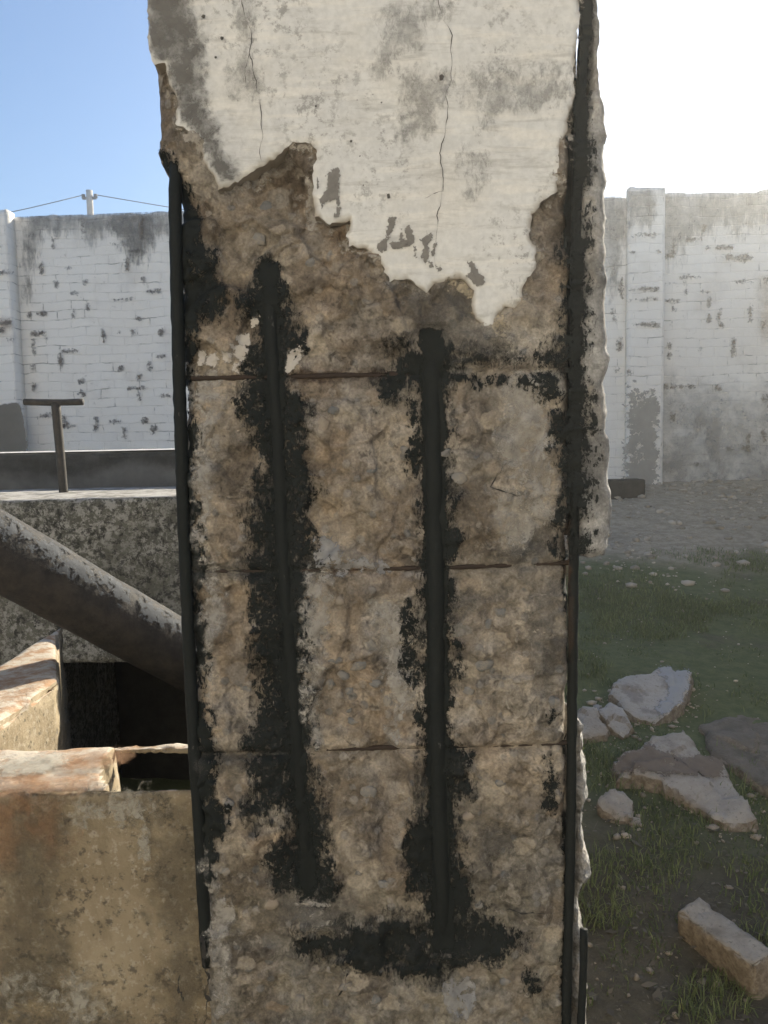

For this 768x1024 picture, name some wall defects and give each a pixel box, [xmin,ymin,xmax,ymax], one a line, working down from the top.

crack [241,0,263,158]
crack [430,0,453,272]
spalling [575,0,589,100]
spalling [0,68,588,1024]